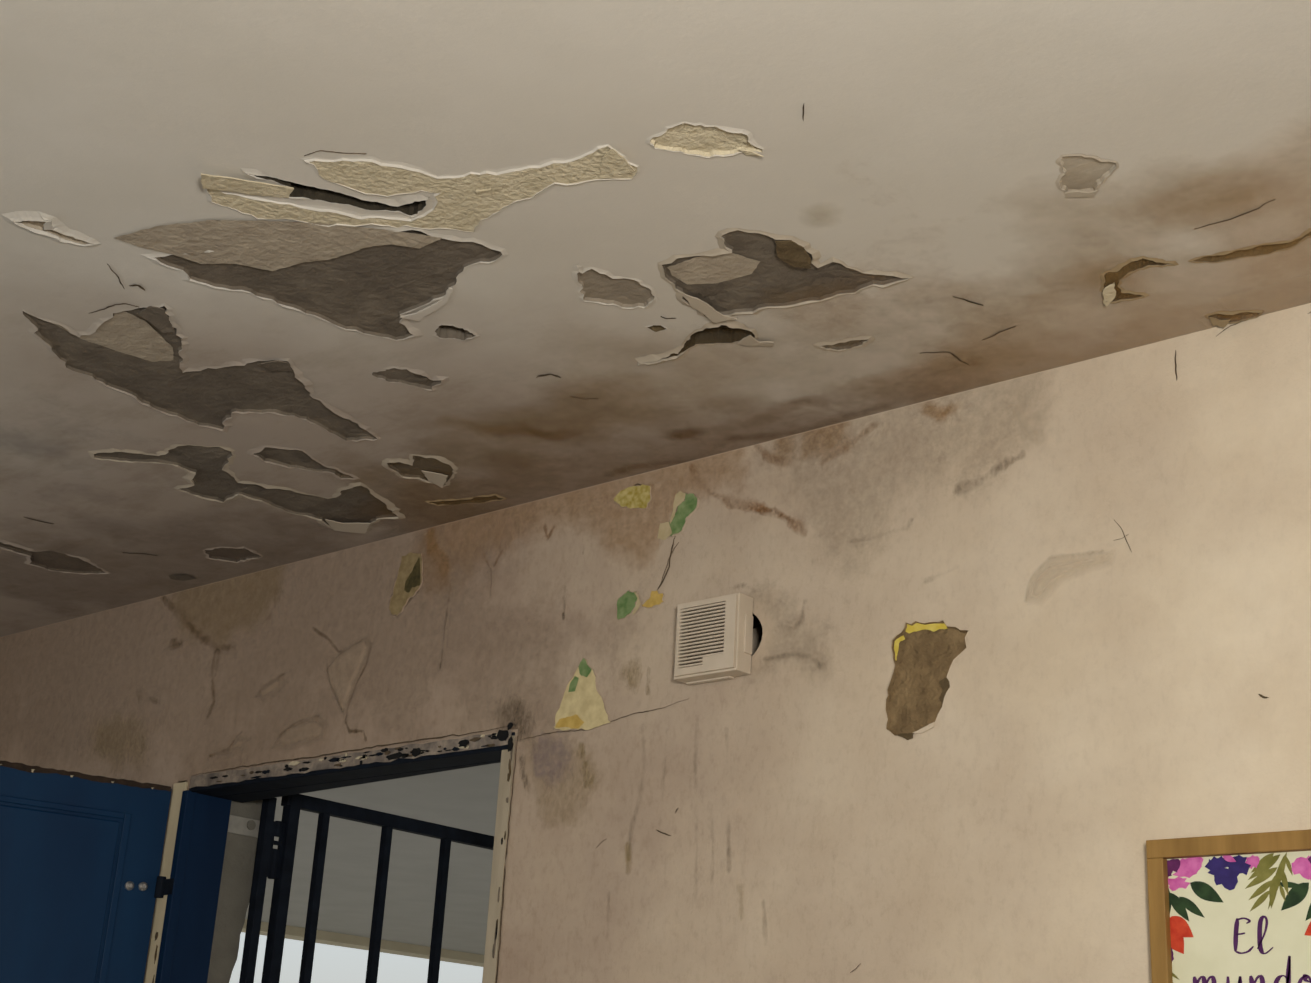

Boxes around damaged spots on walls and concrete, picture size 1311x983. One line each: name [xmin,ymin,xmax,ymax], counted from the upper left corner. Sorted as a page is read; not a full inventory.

peeling [1,144,641,342]
peeling [646,121,765,159]
peeling [572,228,914,366]
peeling [1055,153,1119,197]
crack [1195,199,1275,229]
peeling [19,303,406,534]
peeling [370,365,450,392]
peeling [381,454,507,506]
peeling [616,491,700,620]
peeling [554,658,611,731]
flaking render [885,619,970,740]
peeling [189,722,518,983]